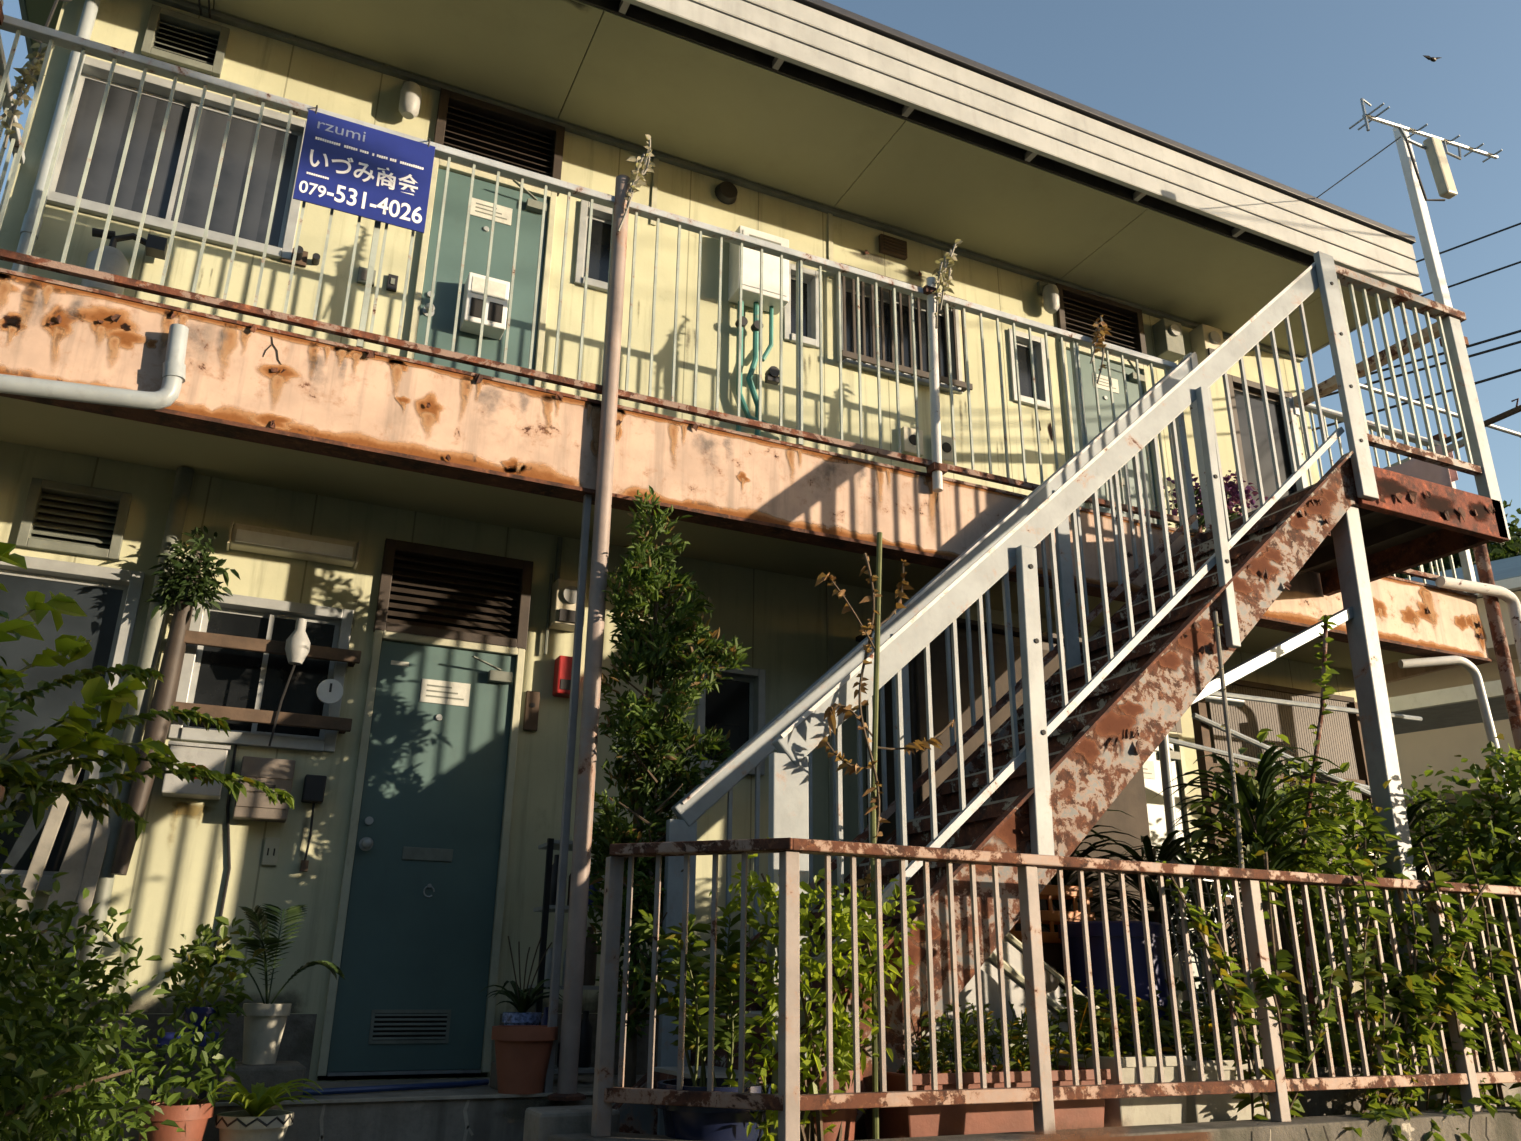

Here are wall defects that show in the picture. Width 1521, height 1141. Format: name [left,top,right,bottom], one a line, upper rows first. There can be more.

corrosion [0,272,1024,524]
corrosion [621,486,959,558]
corrosion [1080,511,1194,537]
corrosion [1290,488,1338,530]
corrosion [1375,477,1495,522]
corrosion [1037,568,1141,592]
corrosion [1233,547,1292,595]
corrosion [1158,619,1217,671]
corrosion [1263,610,1347,632]
corrosion [1372,577,1487,657]
corrosion [1073,700,1145,764]
corrosion [975,803,1031,872]